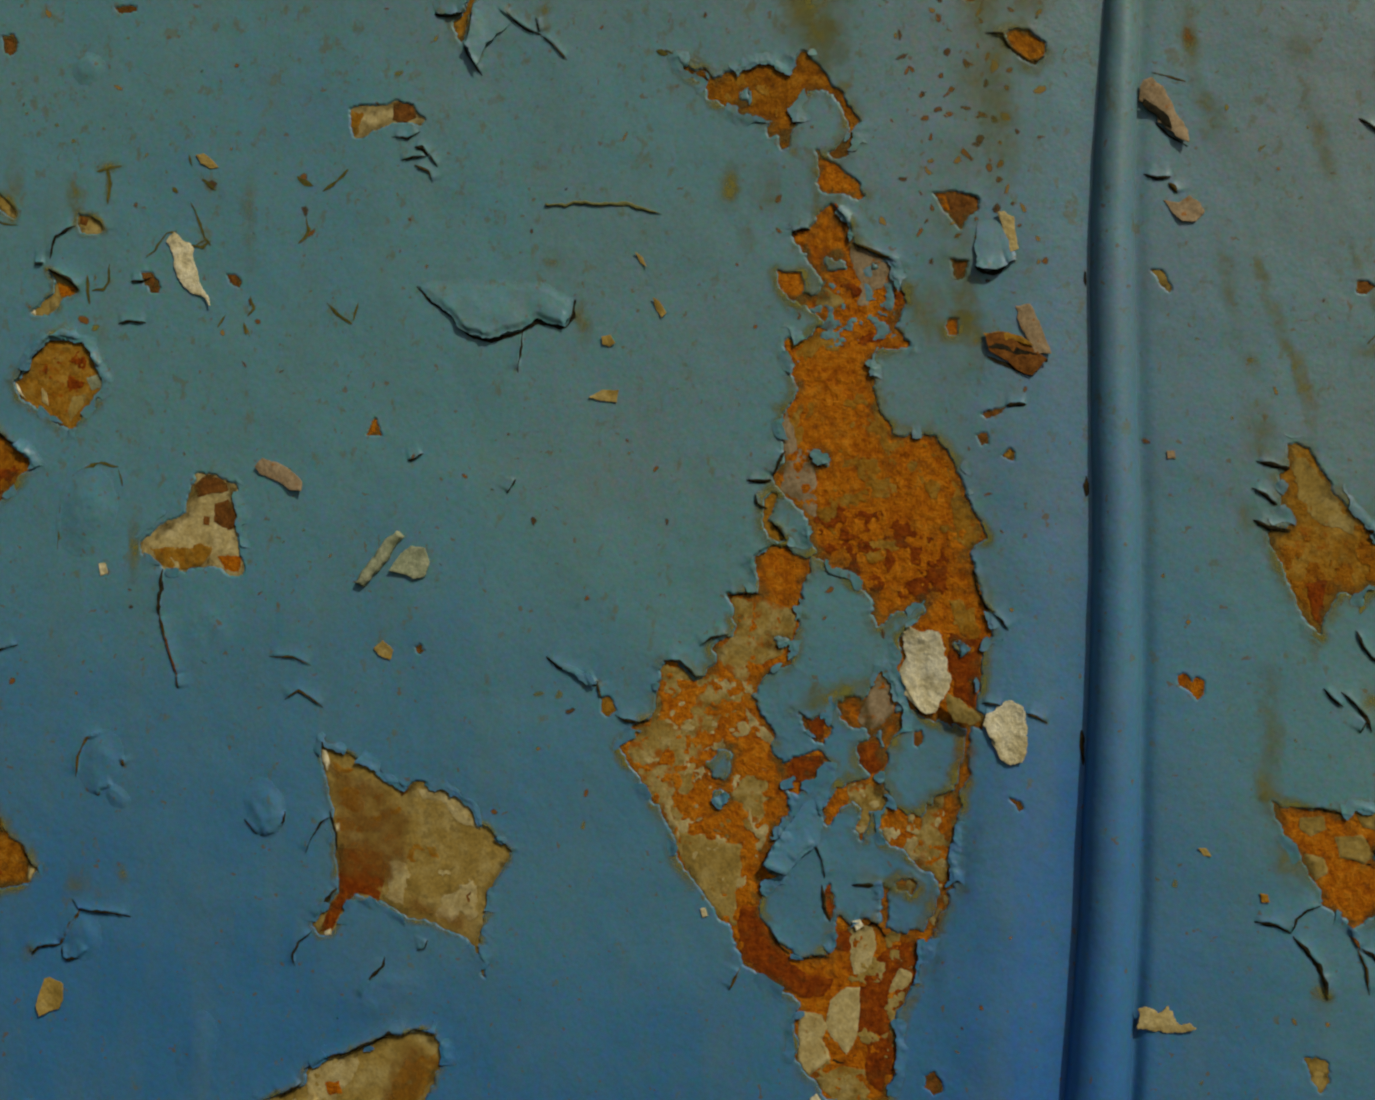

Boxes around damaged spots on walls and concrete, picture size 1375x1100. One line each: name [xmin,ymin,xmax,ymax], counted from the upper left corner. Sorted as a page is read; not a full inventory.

peeling [350,101,426,138]
corrosion [921,73,1019,140]
corrosion [944,43,1018,90]
corrosion [723,174,738,200]
corrosion [954,135,1026,227]
peeling [983,304,1051,375]
peeling [131,462,252,578]
peeling [608,48,1028,1100]
crack [157,568,178,688]
peeling [302,732,511,980]
crack [1254,906,1375,1001]
peeling [252,1019,460,1100]